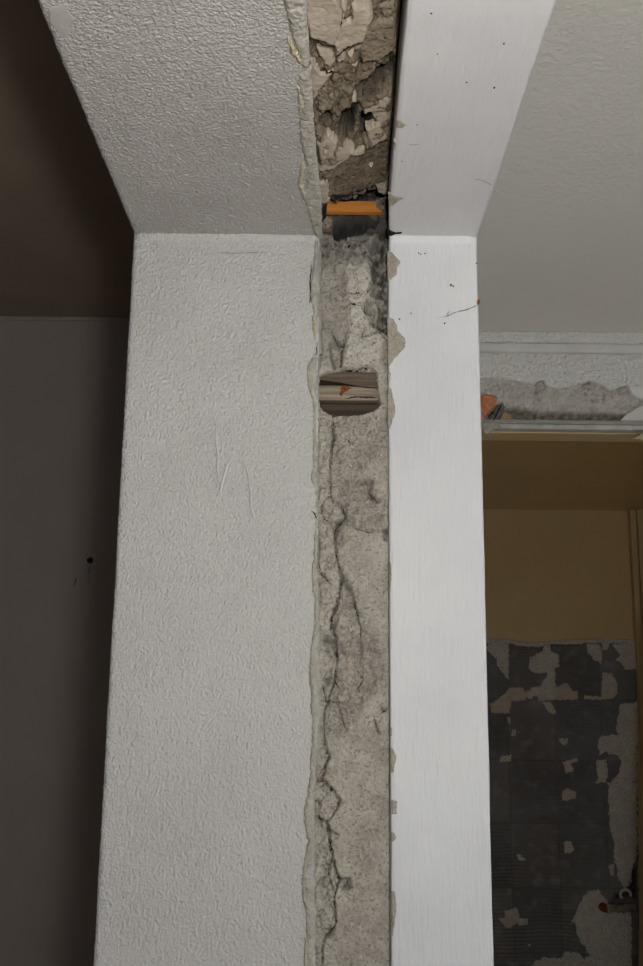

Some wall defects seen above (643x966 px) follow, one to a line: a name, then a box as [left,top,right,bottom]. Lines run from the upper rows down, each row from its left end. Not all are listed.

crack [312,422,371,725]
spalling [284,0,418,966]
spalling [480,378,643,435]
crack [318,743,348,931]
flaking render [499,907,528,929]
flaking render [486,638,639,888]
flaking render [533,889,633,966]